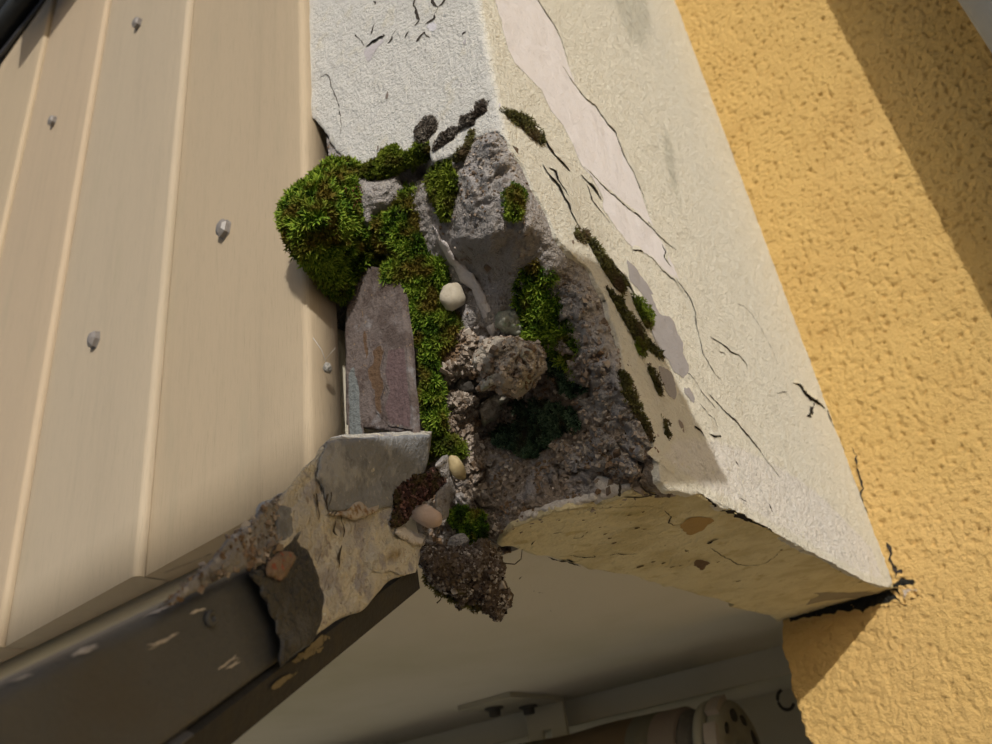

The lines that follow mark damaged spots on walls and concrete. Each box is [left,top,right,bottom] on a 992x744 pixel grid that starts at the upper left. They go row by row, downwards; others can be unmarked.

crack [355,0,445,45]
peeling [495,0,682,287]
spalling [336,302,347,331]
efflorescence [432,225,496,337]
spalling [399,131,676,555]
peeling [617,260,695,403]
crack [538,0,780,477]
crack [618,430,673,525]
crack [852,448,867,511]
peeling [266,551,296,581]
crack [886,542,902,577]
peeling [271,635,330,690]